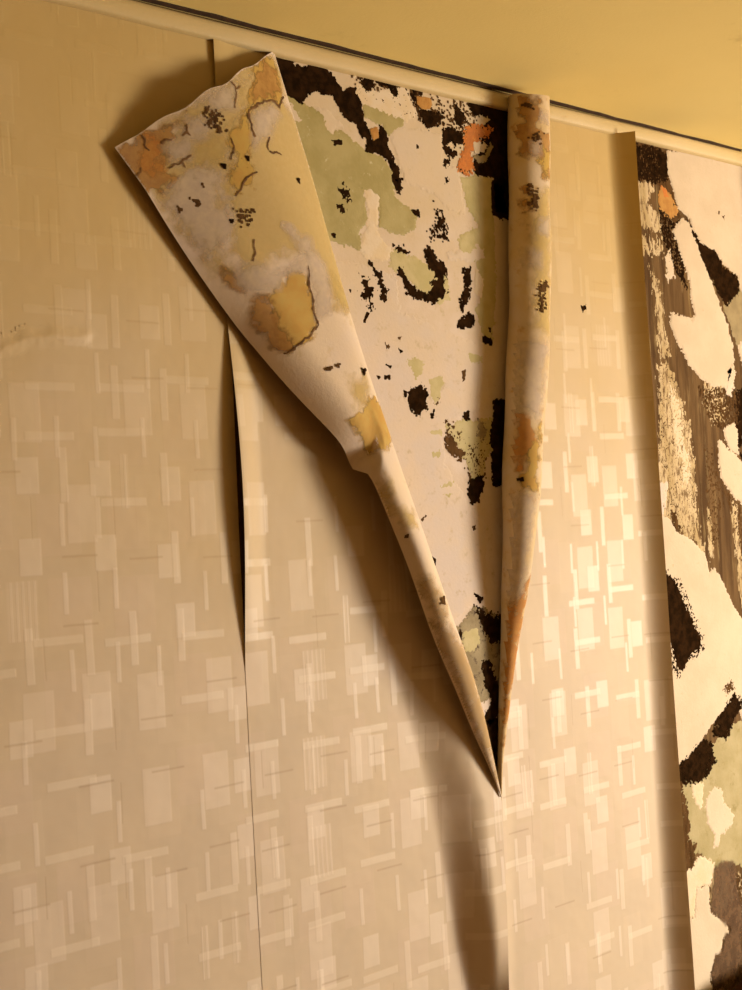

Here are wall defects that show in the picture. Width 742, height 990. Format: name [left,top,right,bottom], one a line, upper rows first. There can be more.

peeling [170,119,208,157]
peeling [210,87,233,109]
peeling [254,107,279,142]
spalling [666,150,742,397]
flaking render [288,70,533,718]
spalling [717,423,742,505]
spalling [662,515,742,990]